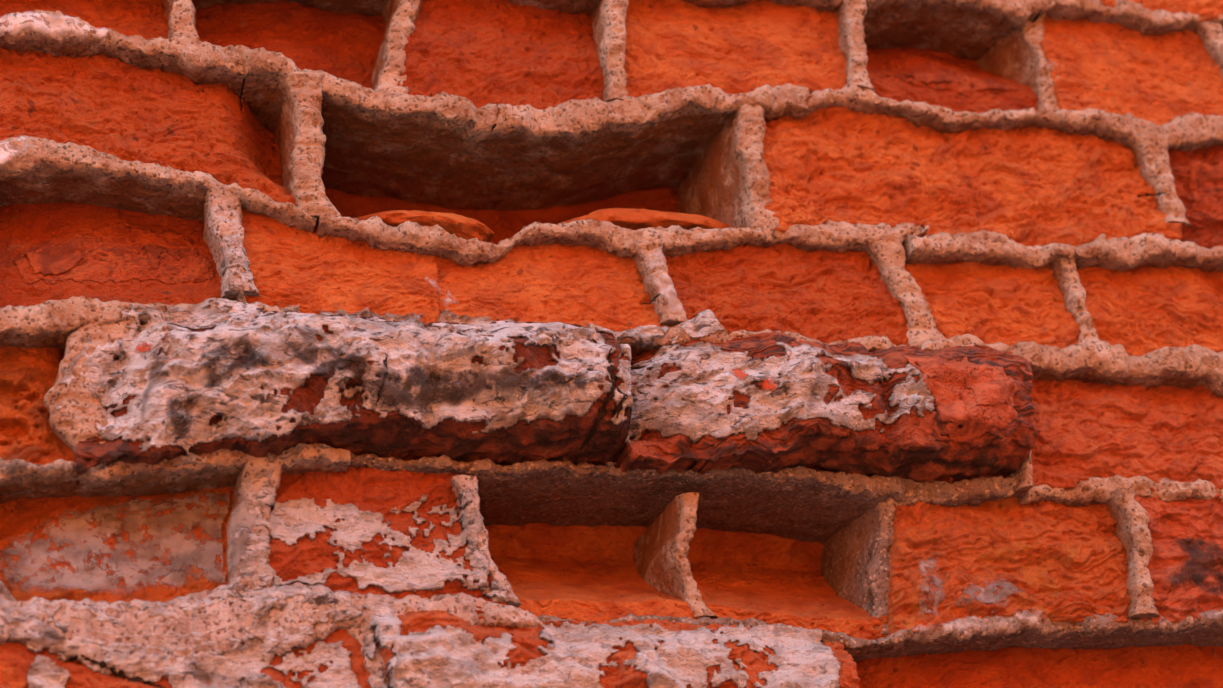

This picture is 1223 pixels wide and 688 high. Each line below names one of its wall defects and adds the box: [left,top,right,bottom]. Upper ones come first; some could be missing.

spalling [886,72,1018,99]
spalling [357,210,494,242]
spalling [560,208,732,230]
flaking render [0,222,1018,688]